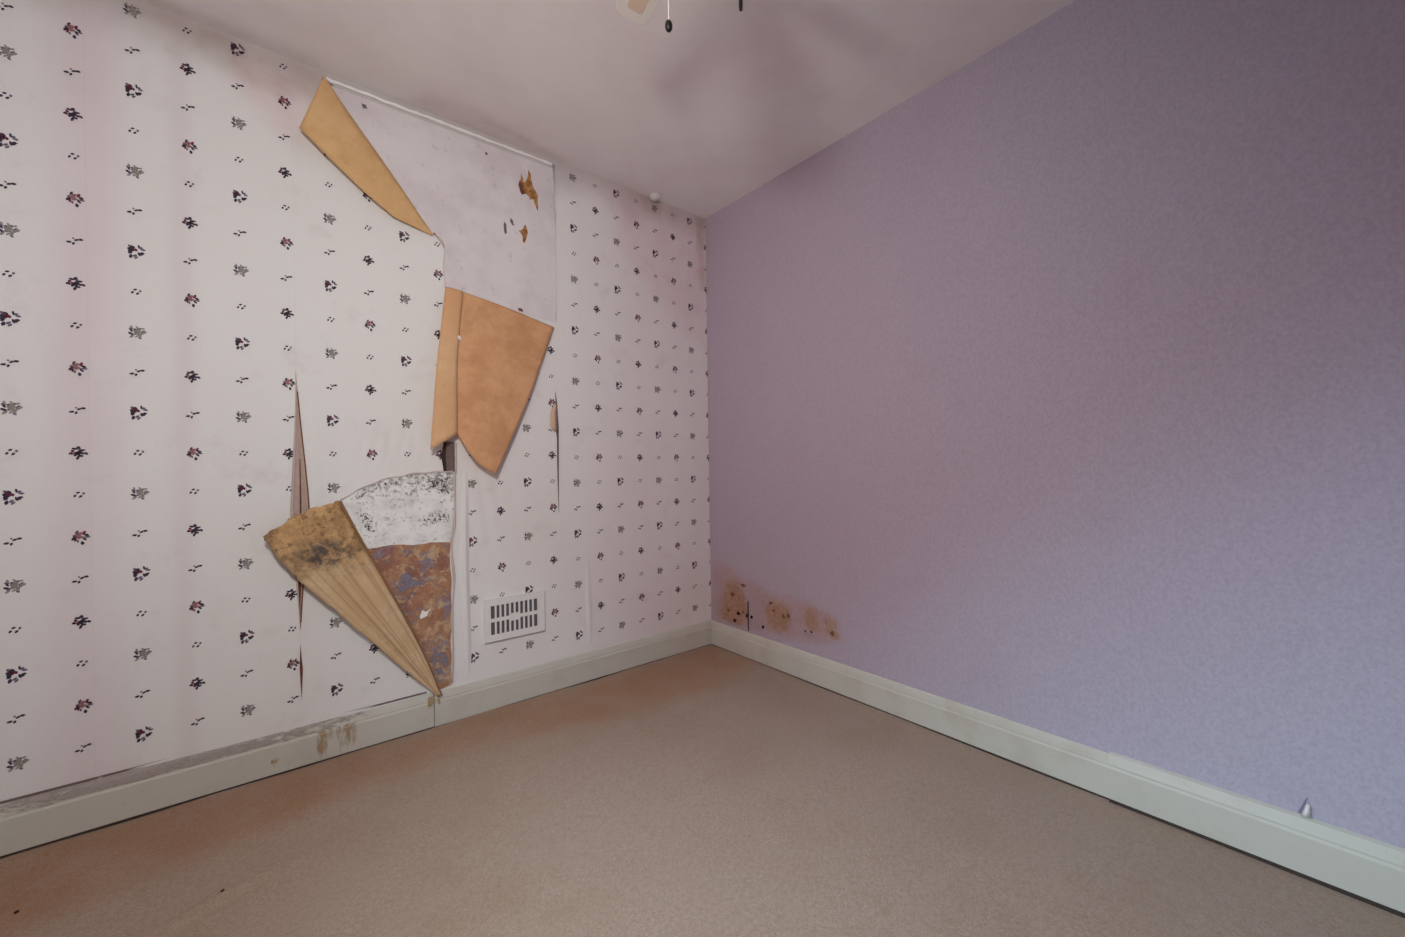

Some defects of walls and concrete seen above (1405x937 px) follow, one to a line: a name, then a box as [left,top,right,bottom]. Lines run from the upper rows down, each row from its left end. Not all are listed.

peeling [326,77,552,211]
leakage [727,584,764,631]